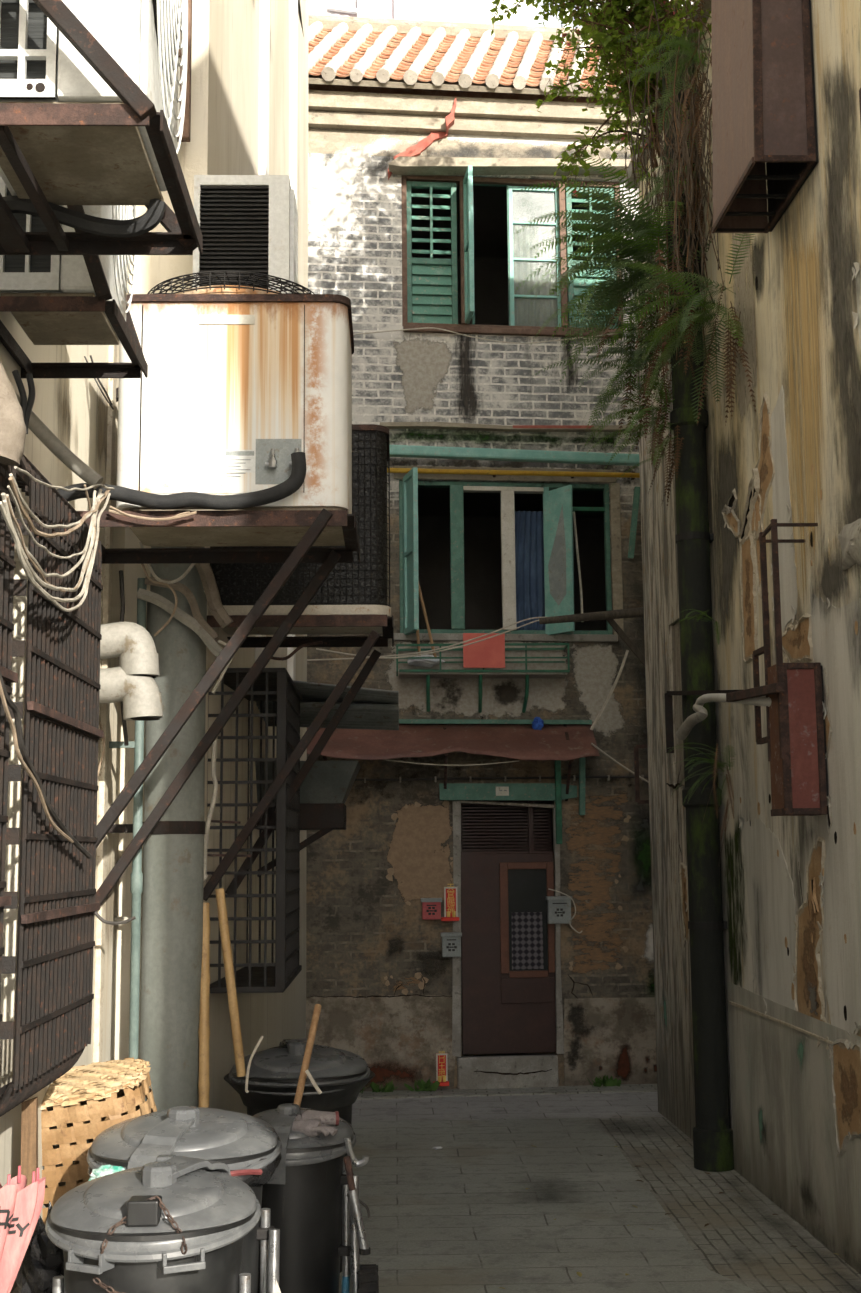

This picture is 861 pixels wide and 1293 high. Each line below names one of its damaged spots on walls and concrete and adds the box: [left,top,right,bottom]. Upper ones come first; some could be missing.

leakage [455,334,478,420]
leakage [562,337,578,391]
flaking render [722,233,861,1157]
flaking render [386,800,453,906]
peeling [645,924,654,960]